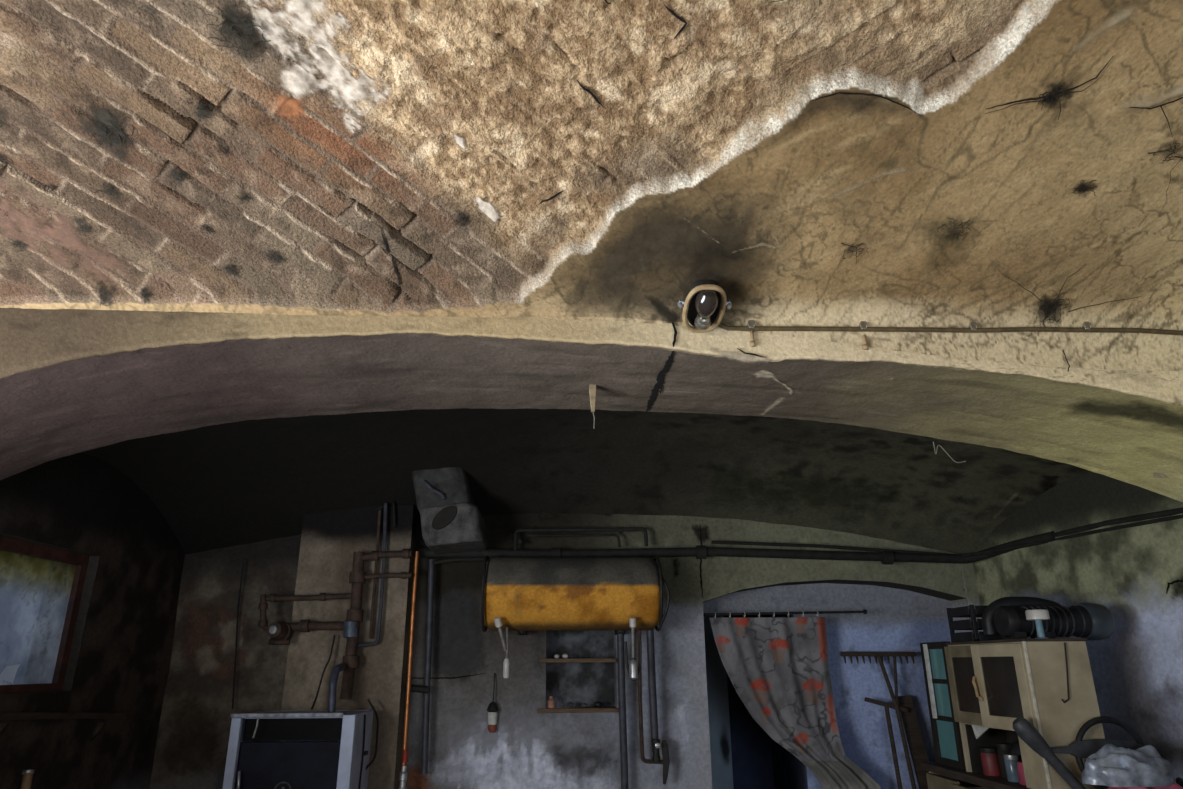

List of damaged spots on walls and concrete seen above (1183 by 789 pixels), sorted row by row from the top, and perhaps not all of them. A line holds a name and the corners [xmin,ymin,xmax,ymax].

crack [664,4,687,39]
efflorescence [249,0,391,133]
crack [577,80,604,108]
crack [811,92,921,116]
crack [987,56,1113,109]
flaking render [0,0,1057,313]
water stain [650,299,678,323]
crack [645,323,677,412]
water stain [1075,403,1183,427]
water stain [449,735,614,789]